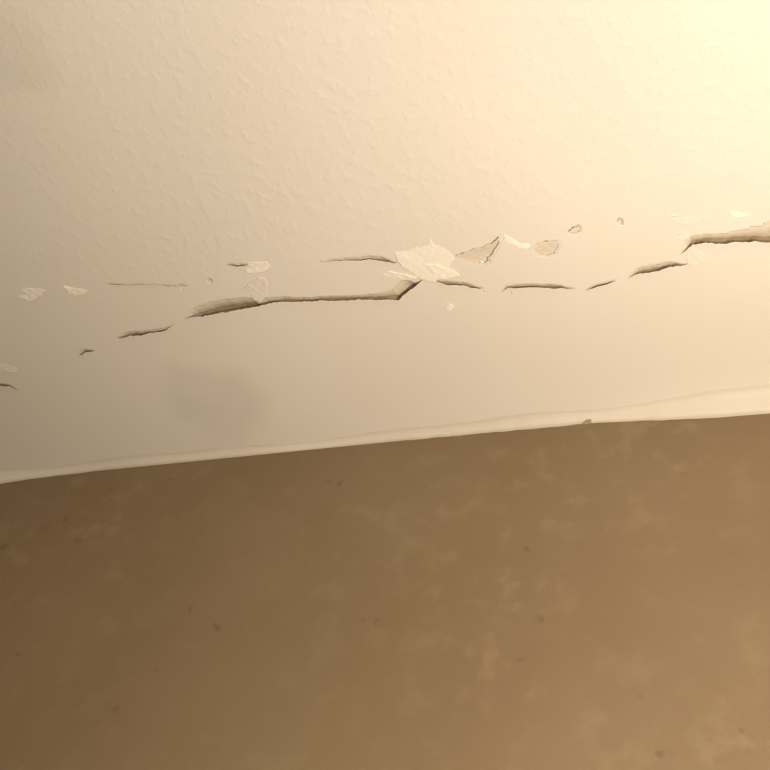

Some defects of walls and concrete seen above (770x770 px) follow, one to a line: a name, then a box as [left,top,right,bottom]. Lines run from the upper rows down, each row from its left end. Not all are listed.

crack [104,220,770,342]
peeling [381,235,561,282]
crack [0,383,18,391]